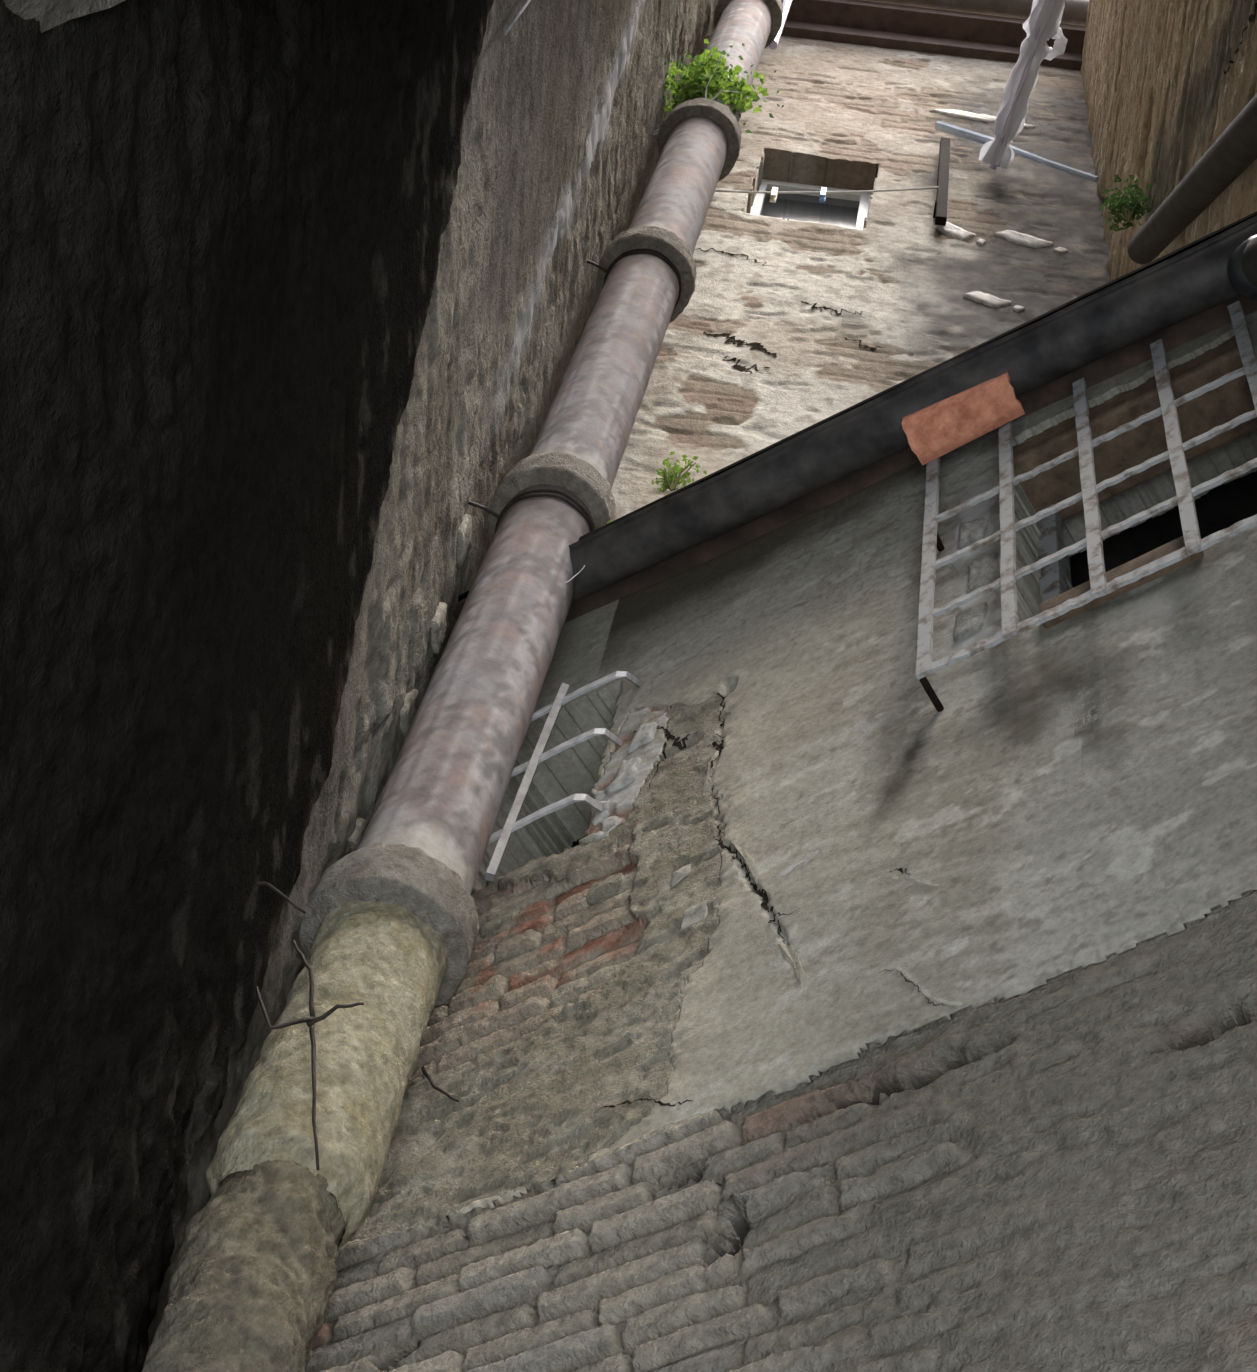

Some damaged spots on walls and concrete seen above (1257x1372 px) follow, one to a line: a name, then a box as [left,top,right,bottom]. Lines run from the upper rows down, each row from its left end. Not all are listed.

peeling [457,514,473,570]
peeling [430,602,447,656]
crack [634,692,805,984]
spalling [348,689,730,1242]
spalling [841,1090,893,1109]
spalling [728,1221,749,1256]